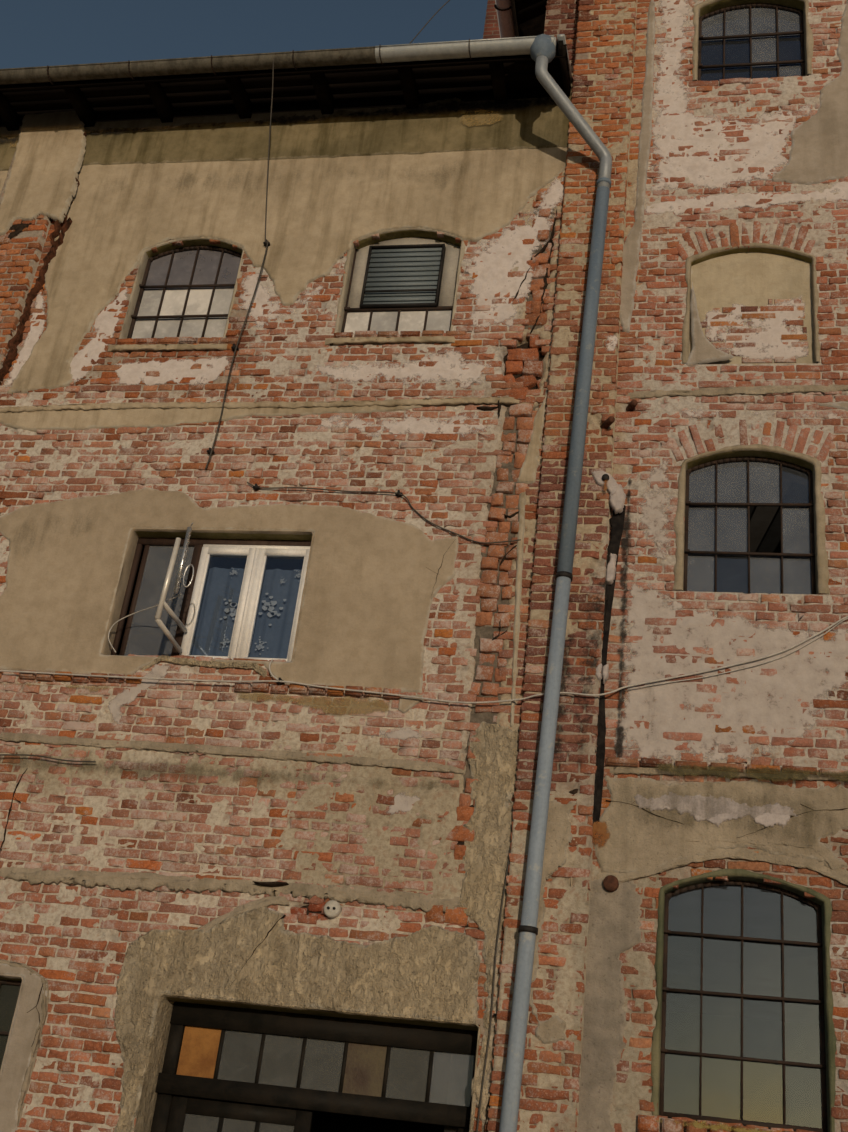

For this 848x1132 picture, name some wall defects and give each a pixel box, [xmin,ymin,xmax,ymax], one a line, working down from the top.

flaking render [84,106,406,134]
flaking render [620,0,656,333]
crack [0,174,80,386]
crack [513,209,557,334]
flaking render [701,297,809,363]
flaking render [0,147,568,1132]
spalling [554,789,578,810]
crack [606,800,682,824]
crack [737,804,848,838]
crack [253,880,289,888]
crack [230,914,286,986]
flaking render [577,775,848,1132]